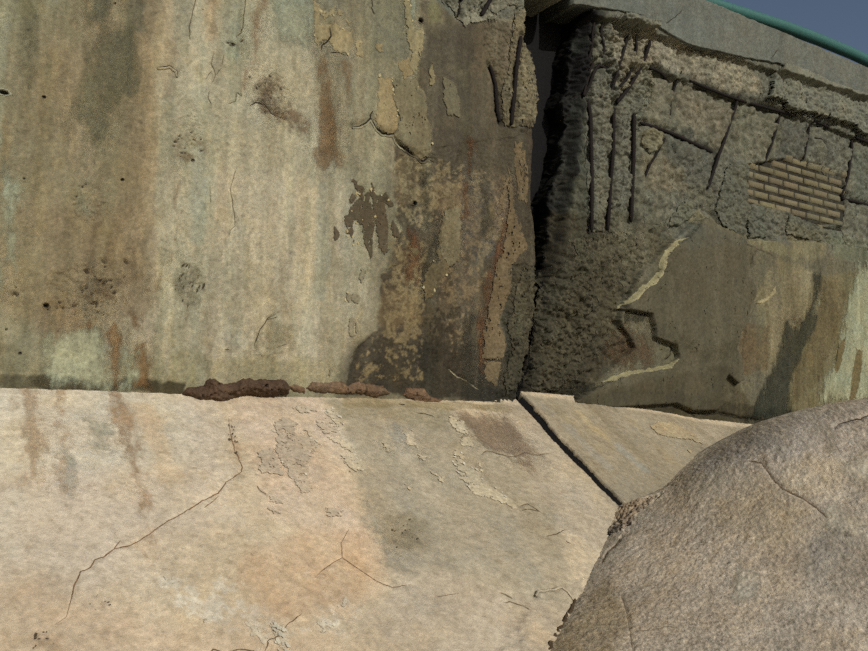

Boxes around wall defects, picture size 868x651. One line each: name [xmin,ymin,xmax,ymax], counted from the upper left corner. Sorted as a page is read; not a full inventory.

rust [315,67,338,168]
flaking render [374,0,461,160]
spalling [442,0,539,128]
peeling [333,179,399,258]
spalling [481,12,868,401]
leakage [41,328,140,391]
crack [516,282,545,399]
leakage [746,274,821,422]
leakage [820,262,868,403]
crack [56,426,243,624]
crack [319,531,410,587]
crack [211,614,301,651]